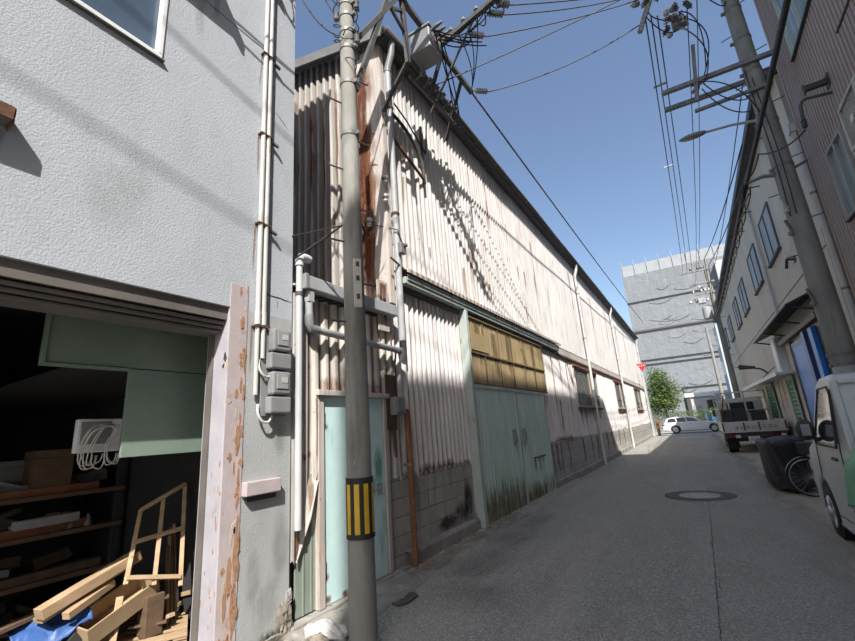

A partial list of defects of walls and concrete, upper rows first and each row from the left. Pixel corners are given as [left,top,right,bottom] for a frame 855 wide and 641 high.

corrosion [310,104,325,193]
corrosion [356,76,386,302]
peeling [200,347,246,641]
spalling [261,587,293,641]
leakage [416,442,572,571]
crack [708,487,722,641]